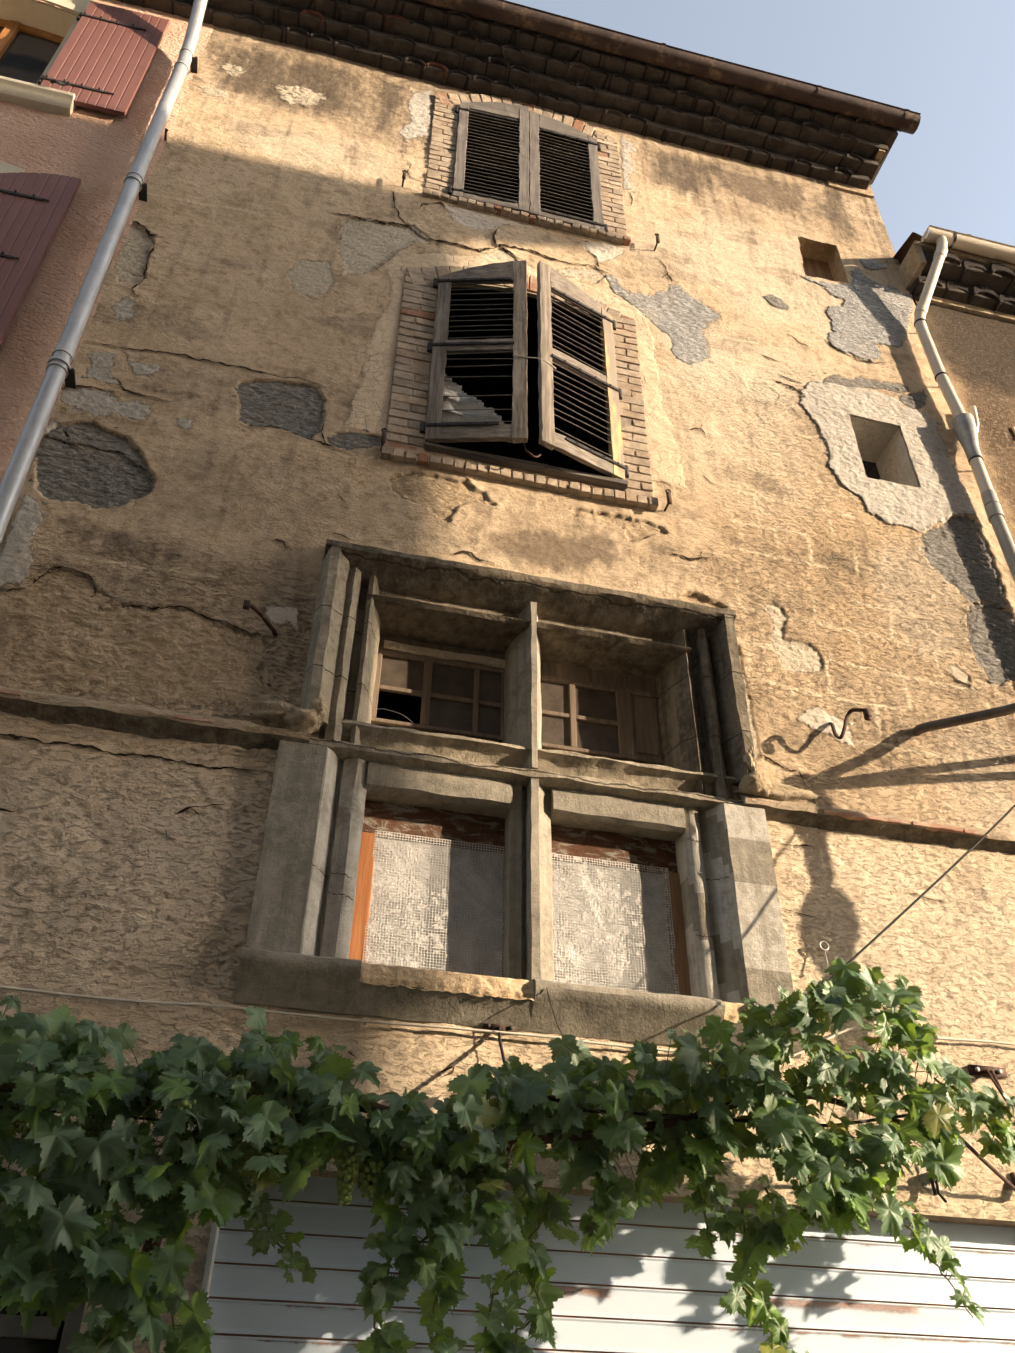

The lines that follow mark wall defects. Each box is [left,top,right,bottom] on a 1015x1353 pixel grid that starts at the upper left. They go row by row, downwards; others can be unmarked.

water stain [657,154,715,194]
crack [338,162,607,273]
spalling [231,381,381,450]
spalling [815,372,927,409]
spalling [28,422,153,517]
crack [6,566,263,640]
spalling [921,516,1015,691]